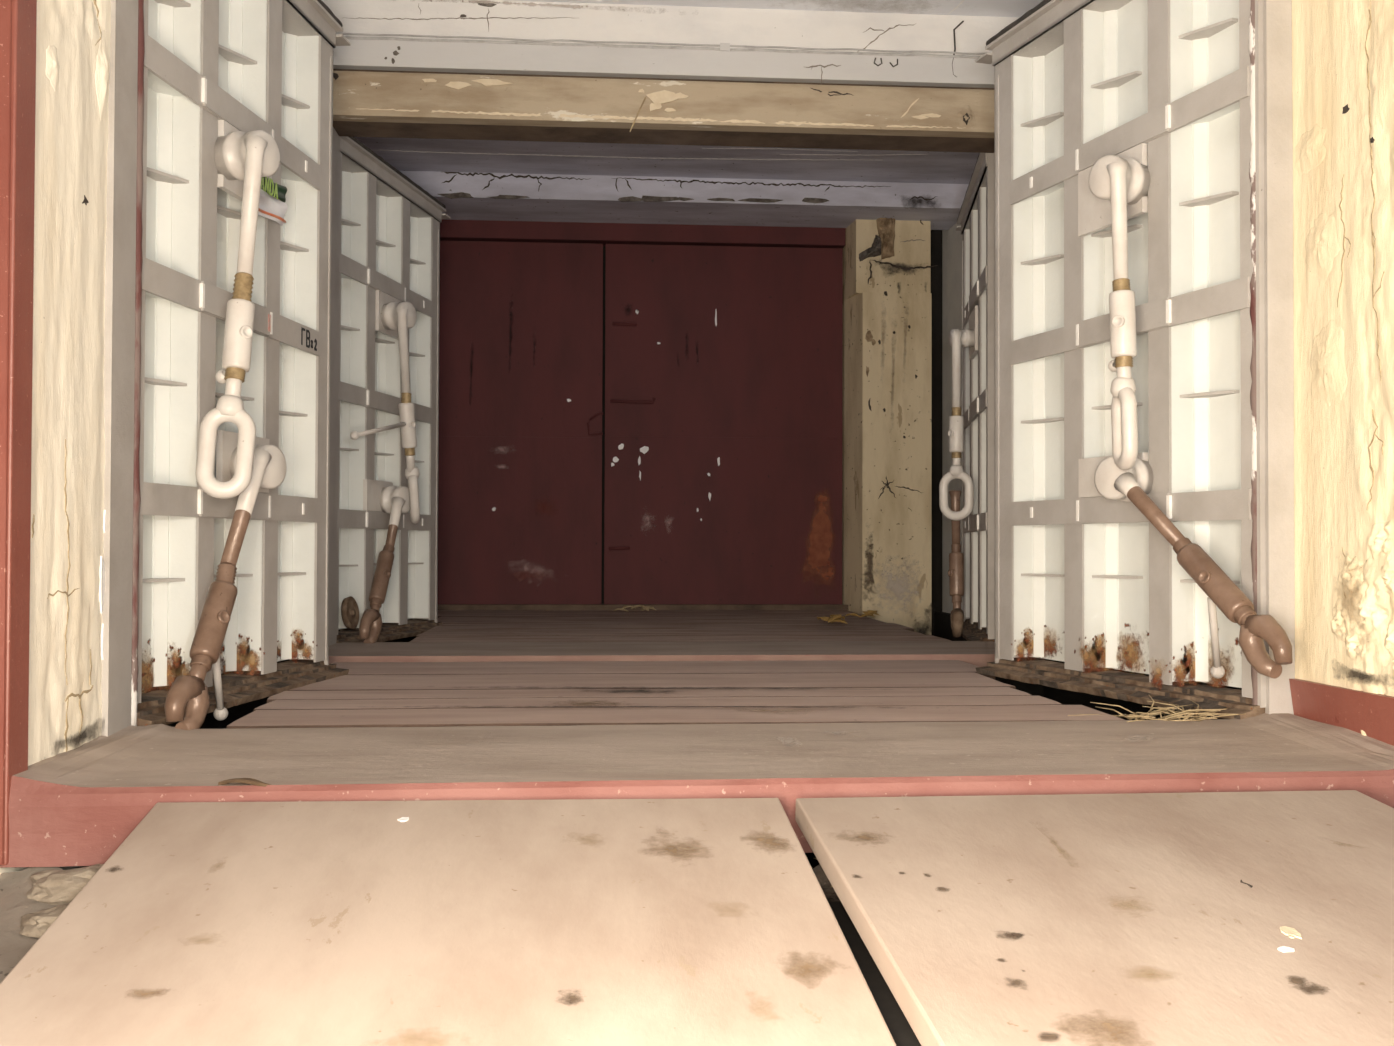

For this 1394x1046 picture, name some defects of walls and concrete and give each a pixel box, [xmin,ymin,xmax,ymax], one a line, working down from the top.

crack [350,5,570,31]
peeling [422,79,512,90]
peeling [638,89,688,112]
crack [355,24,958,284]
crack [1337,0,1384,509]
spalling [611,444,649,480]
corrosion [802,492,835,584]
crack [32,439,93,752]
corrosion [141,639,190,693]
corrosion [220,630,317,675]
corrosion [1011,625,1057,662]
corrosion [1074,623,1242,691]